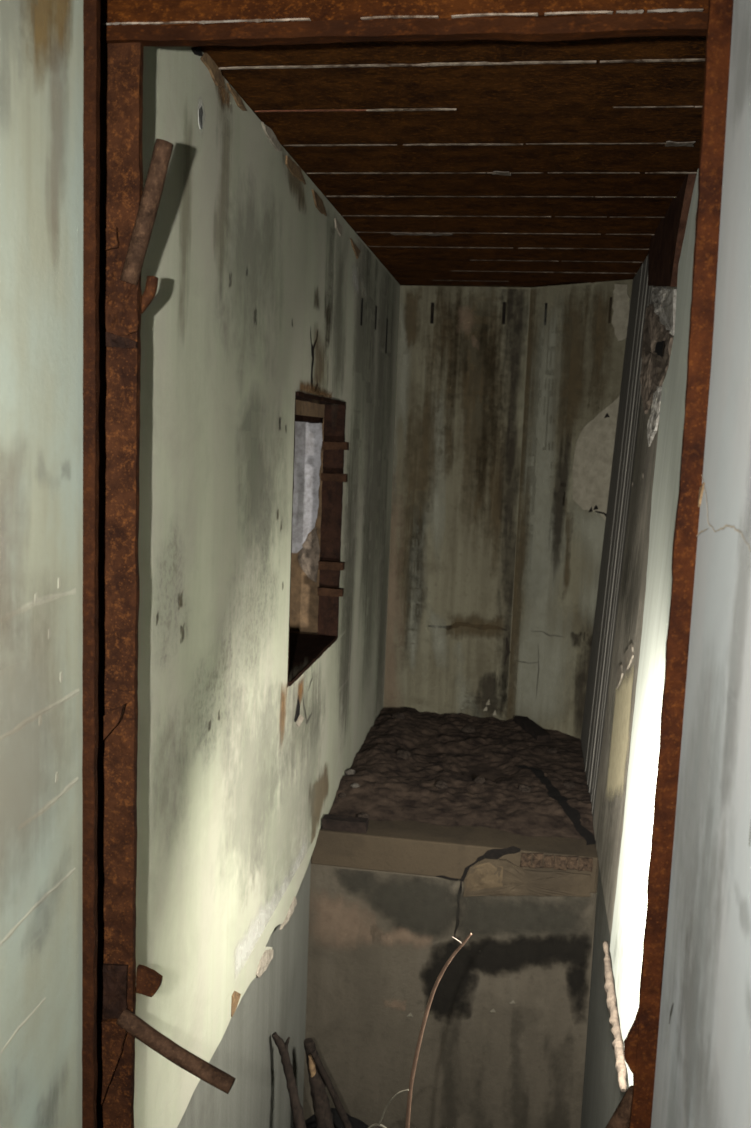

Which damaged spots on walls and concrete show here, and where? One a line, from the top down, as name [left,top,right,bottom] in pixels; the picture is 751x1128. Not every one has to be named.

peeling [612,284,630,341]
spalling [640,287,677,447]
damp [356,232,654,732]
crack [696,477,751,552]
damp [318,871,589,1018]
crack [436,846,521,940]